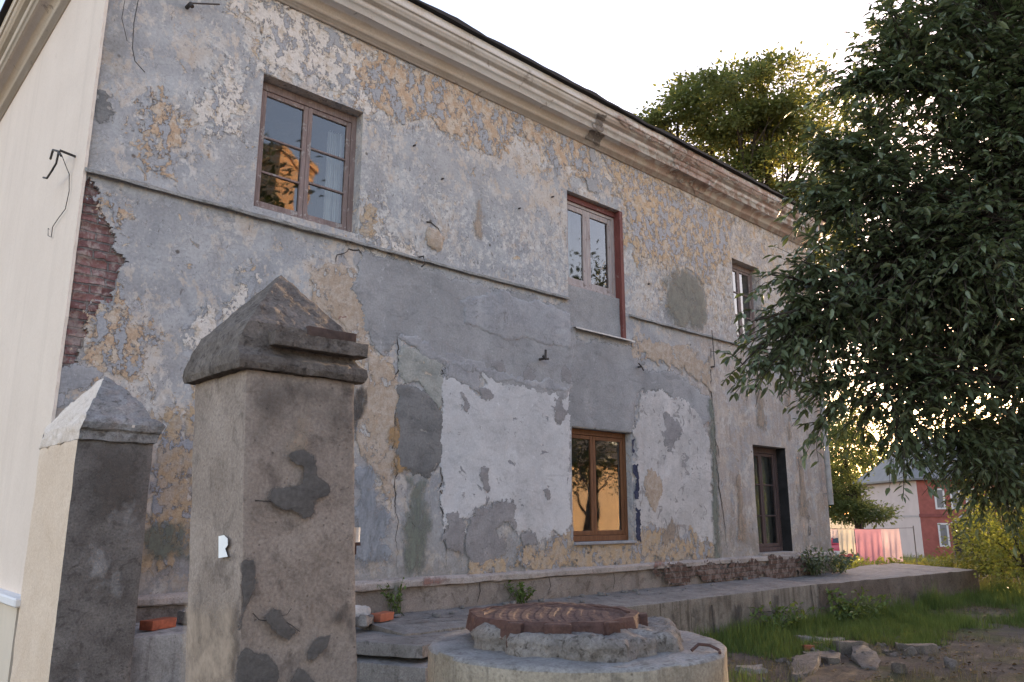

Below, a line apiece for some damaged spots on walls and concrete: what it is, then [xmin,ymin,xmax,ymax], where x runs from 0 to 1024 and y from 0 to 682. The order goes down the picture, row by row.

peeling [123,0,737,291]
flaking render [57,179,164,408]
peeling [141,385,195,573]
crack [391,409,399,574]
peeling [441,466,822,586]
peeling [663,412,682,452]